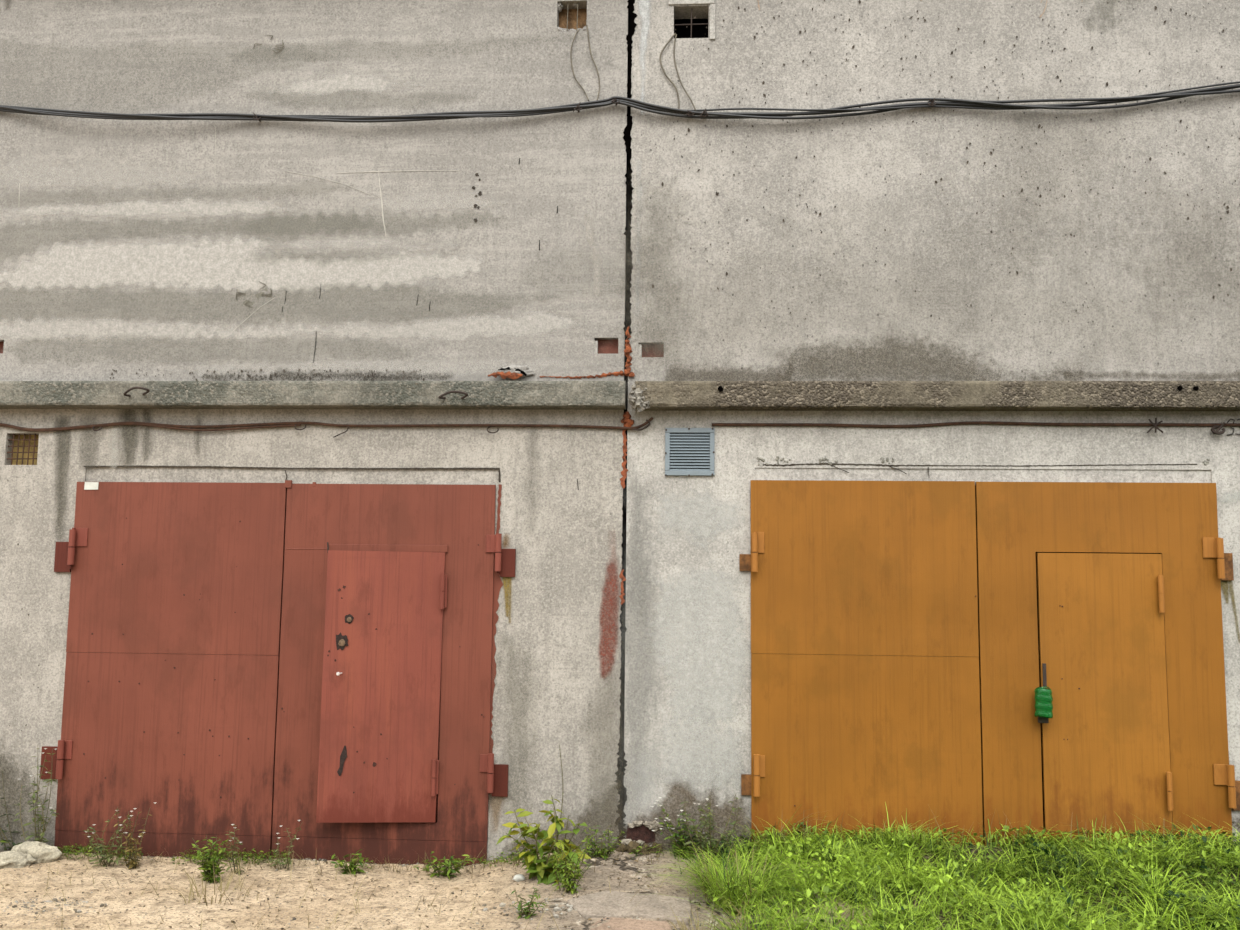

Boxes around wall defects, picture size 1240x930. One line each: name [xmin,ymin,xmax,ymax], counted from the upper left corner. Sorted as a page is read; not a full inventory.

crack [623,0,637,335]
damp [667,337,1000,381]
damp [112,409,149,465]
corrosion [620,430,628,488]
crack [614,497,627,849]